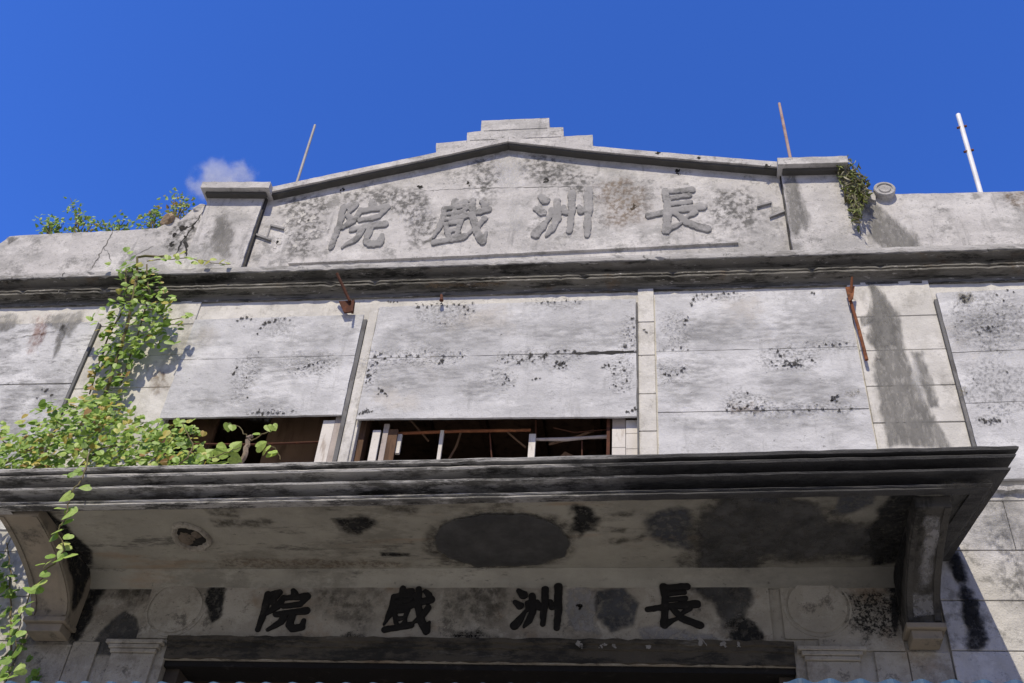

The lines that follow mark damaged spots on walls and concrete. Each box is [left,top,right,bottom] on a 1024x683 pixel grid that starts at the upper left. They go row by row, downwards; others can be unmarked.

crack [92,231,152,268]
crack [177,212,203,256]
damp [212,216,233,256]
damp [860,284,949,447]
spalling [171,522,213,552]
damp [335,517,374,534]
damp [572,505,598,533]
damp [645,489,918,645]
damp [205,587,225,622]
damp [595,588,638,632]
damp [948,553,988,651]
damp [95,611,139,655]